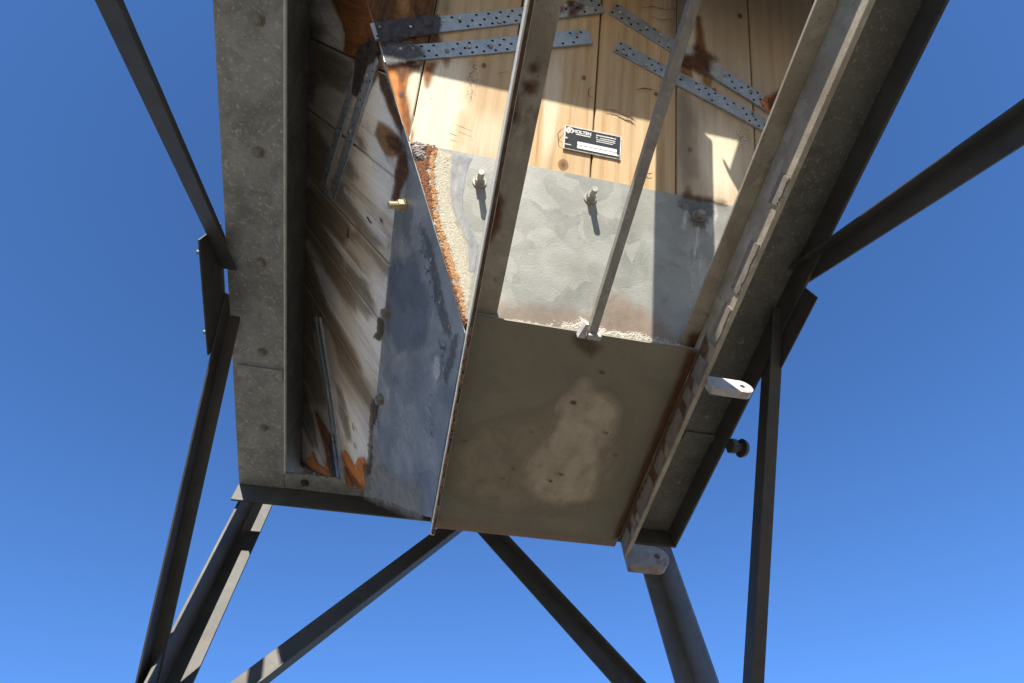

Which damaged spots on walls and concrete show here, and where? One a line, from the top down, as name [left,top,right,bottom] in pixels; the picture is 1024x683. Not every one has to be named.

corrosion [680,16,717,86]
corrosion [761,90,779,112]
corrosion [332,0,537,535]
corrosion [301,400,379,491]
water stain [451,387,621,511]